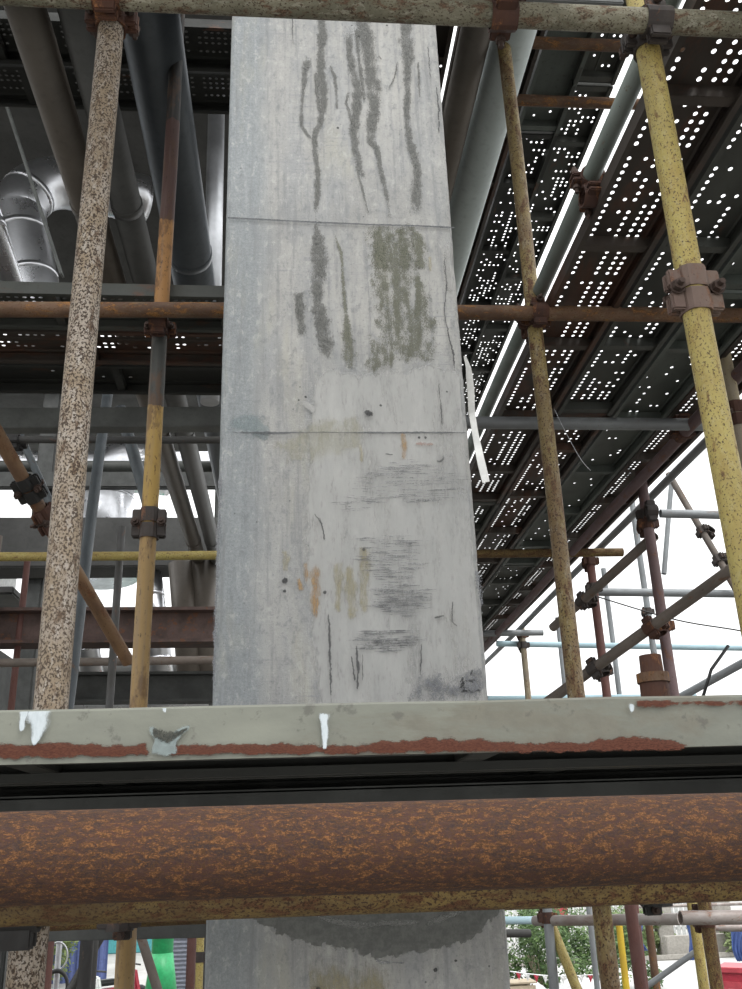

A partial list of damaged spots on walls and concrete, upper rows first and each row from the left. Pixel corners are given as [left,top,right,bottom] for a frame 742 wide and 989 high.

water stain [299,20,422,216]
water stain [370,228,429,269]
water stain [294,225,357,368]
corrosion [0,742,149,760]
corrosion [169,736,686,756]